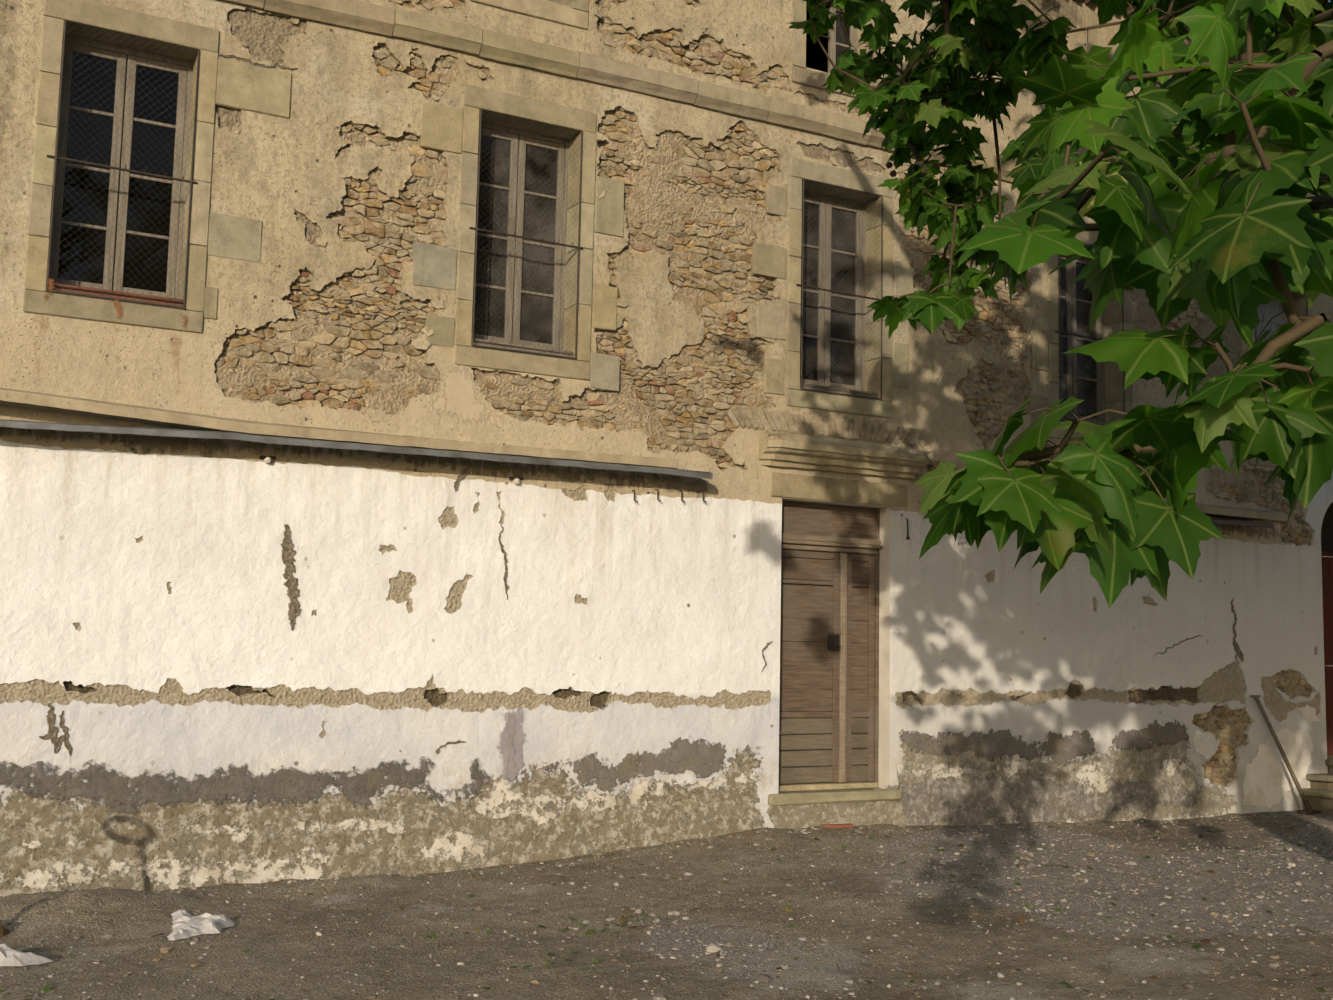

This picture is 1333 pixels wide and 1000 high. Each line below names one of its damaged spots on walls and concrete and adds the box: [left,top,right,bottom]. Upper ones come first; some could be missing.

flaking render [388,0,466,10]
flaking render [796,142,905,196]
flaking render [214,119,447,422]
flaking render [471,107,780,470]
flaking render [899,214,955,293]
flaking render [938,263,1032,450]
flaking render [1131,288,1241,390]
crack [498,524,509,599]
crack [1153,598,1244,663]
flaking render [0,661,1320,897]